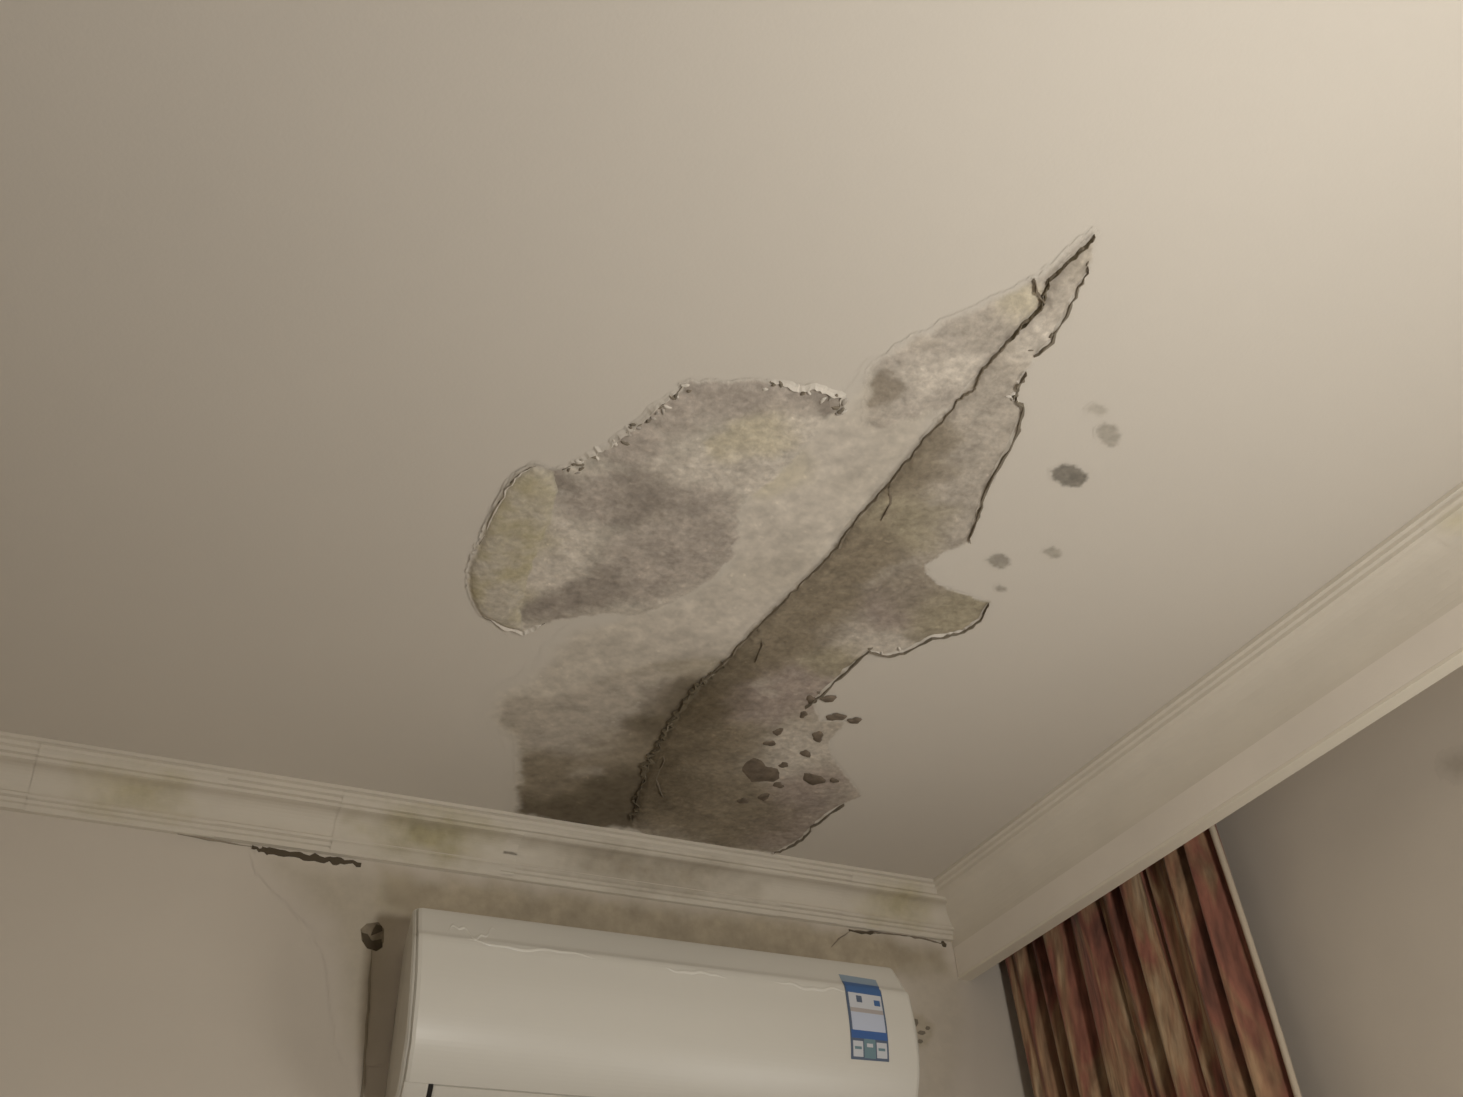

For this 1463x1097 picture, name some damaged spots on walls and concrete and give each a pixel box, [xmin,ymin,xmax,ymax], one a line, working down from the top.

water stain [1083,401,1125,450]
water stain [1048,462,1091,489]
peeling [464,227,1102,854]
crack [629,234,1096,822]
water stain [983,551,1013,594]
water stain [250,355,976,1097]
crack [178,834,361,867]